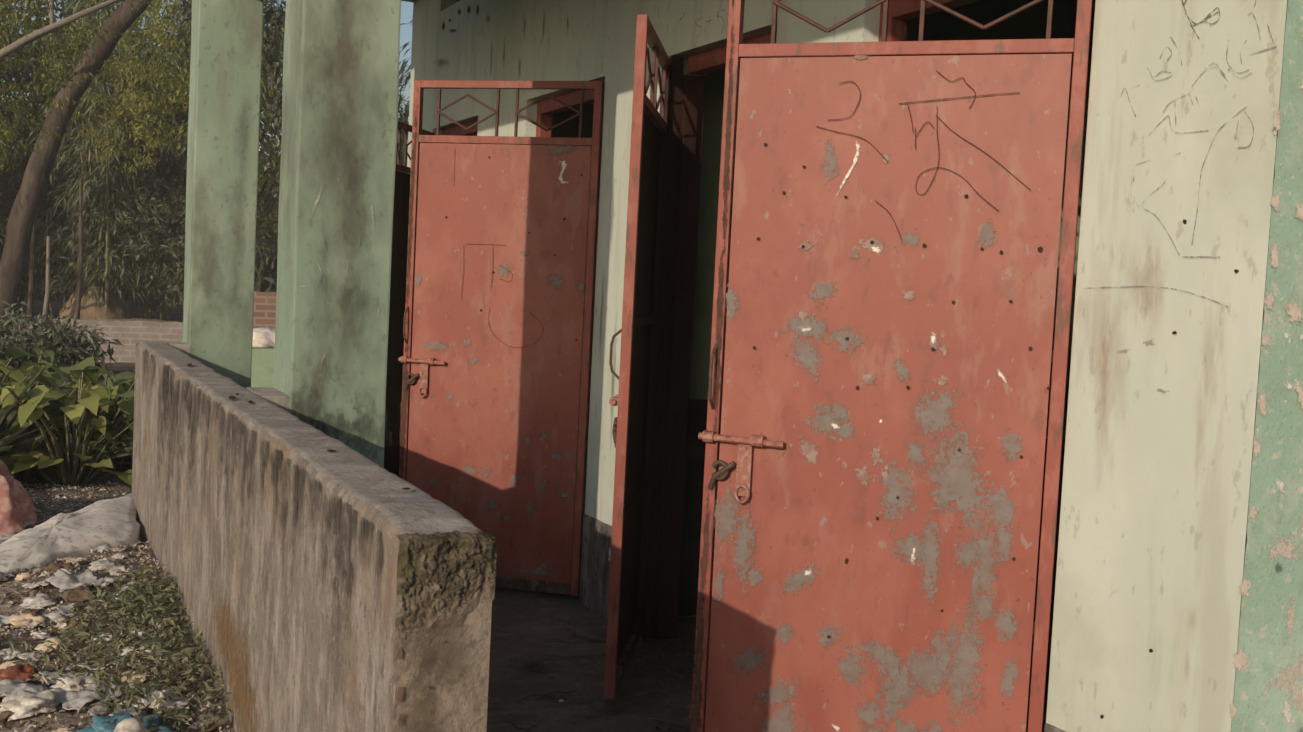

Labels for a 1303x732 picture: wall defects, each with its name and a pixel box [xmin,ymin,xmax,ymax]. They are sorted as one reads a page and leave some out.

peeling [847,232,921,259]
peeling [725,284,739,318]
peeling [780,282,867,381]
peeling [797,403,856,466]
damp [143,349,381,620]
peeling [713,480,821,607]
peeling [818,379,1023,732]
peeling [753,678,807,732]